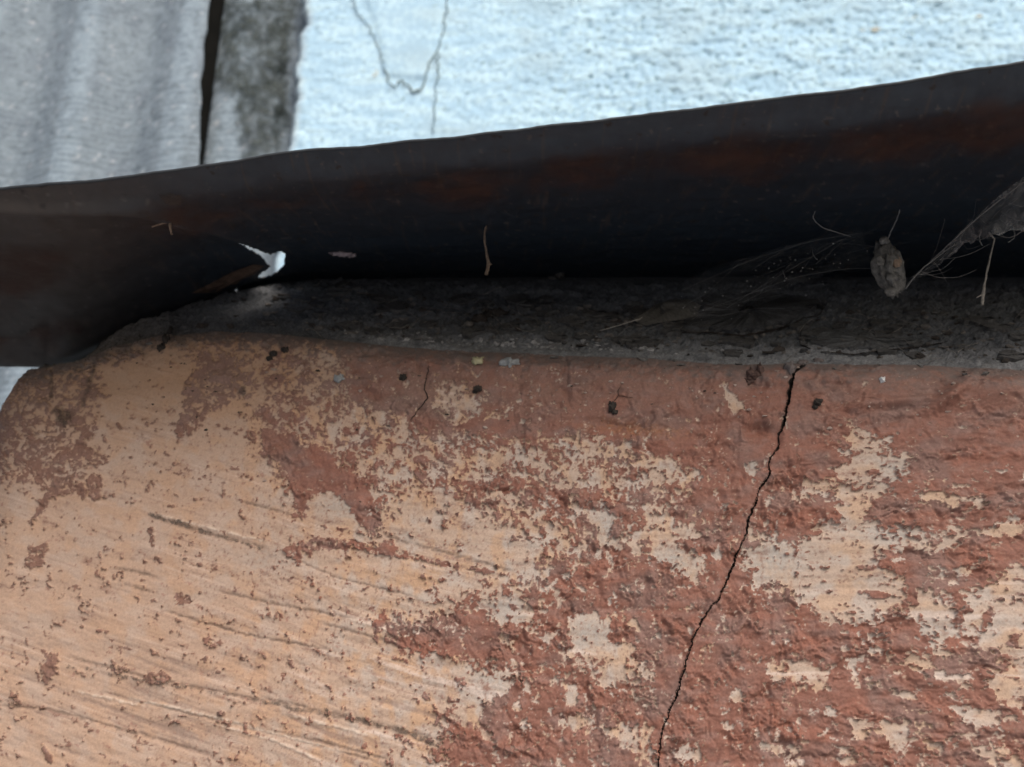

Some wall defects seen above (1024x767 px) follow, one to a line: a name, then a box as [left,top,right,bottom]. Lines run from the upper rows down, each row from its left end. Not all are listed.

leakage [215,0,298,157]
crack [353,0,448,133]
peeling [719,382,745,414]
peeling [0,334,722,767]
crack [656,307,948,767]
peeling [740,427,1024,728]
peeling [729,688,744,703]
peeling [759,743,800,756]
peeling [837,756,858,766]
peeling [823,706,945,756]
peeling [972,741,1023,767]